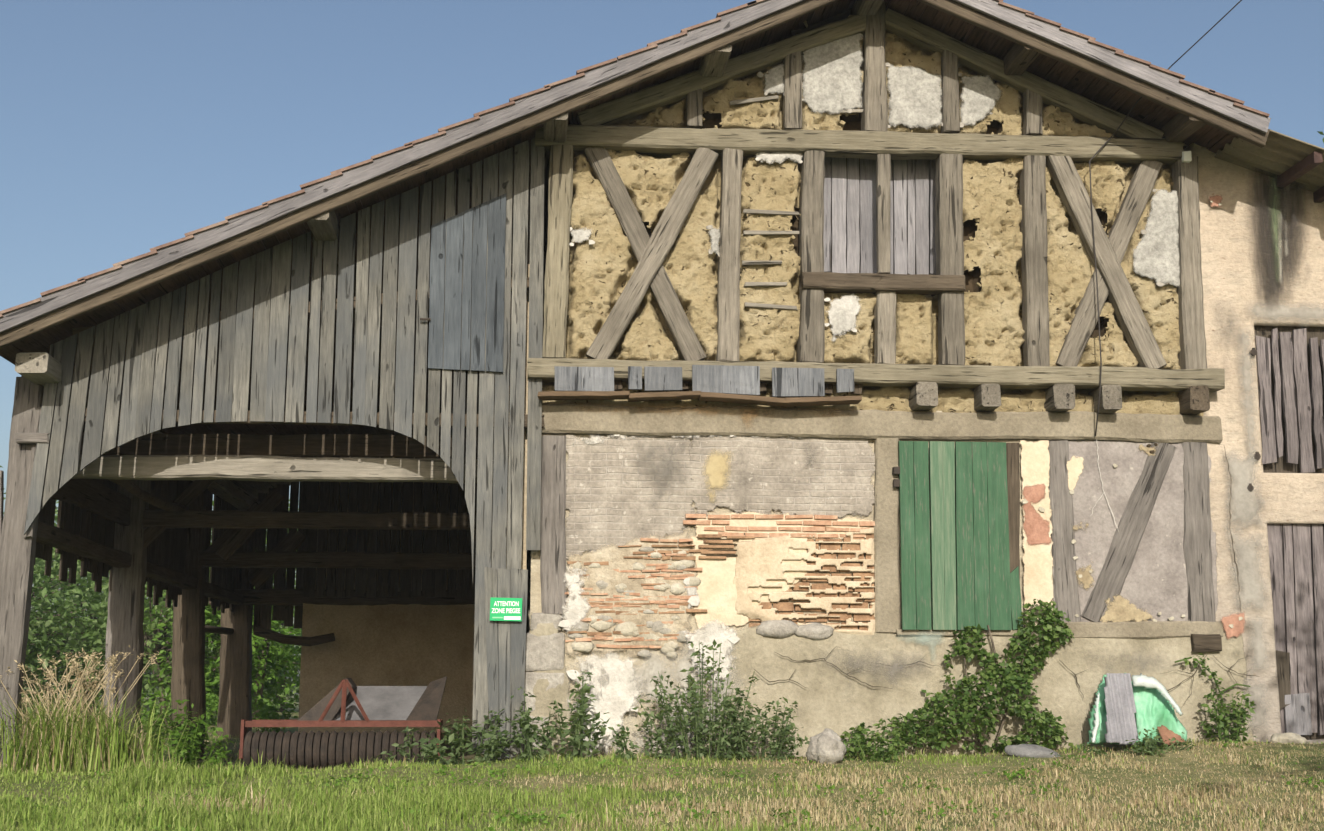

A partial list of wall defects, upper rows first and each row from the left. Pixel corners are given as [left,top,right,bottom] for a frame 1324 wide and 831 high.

leakage [1258,169,1300,301]
flaking render [1022,484,1051,545]
flaking render [558,511,875,754]
crack [754,647,940,689]